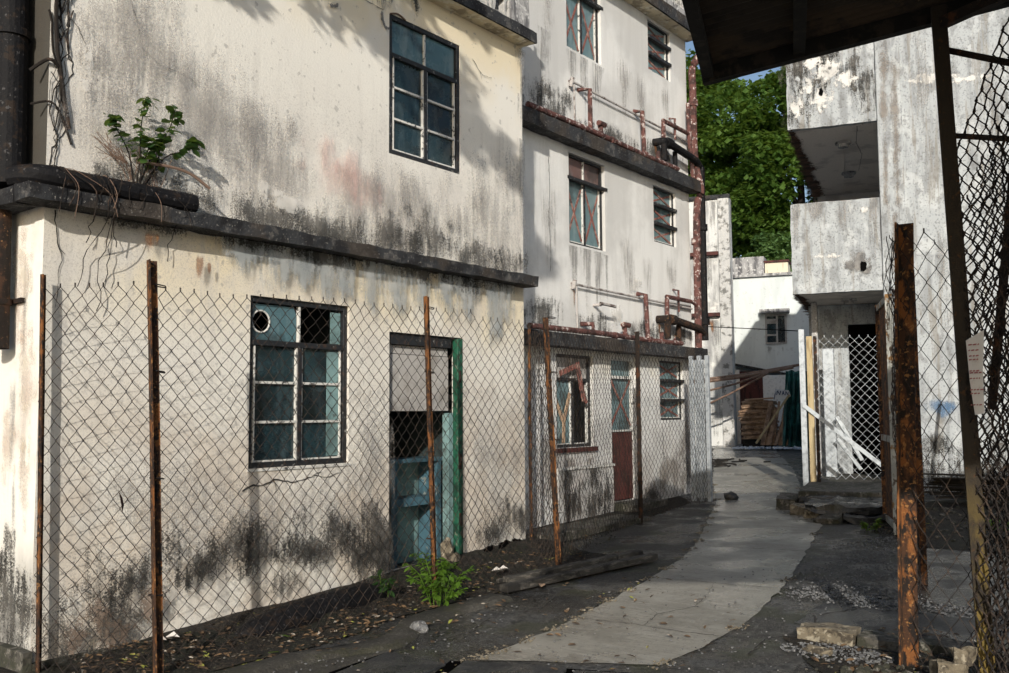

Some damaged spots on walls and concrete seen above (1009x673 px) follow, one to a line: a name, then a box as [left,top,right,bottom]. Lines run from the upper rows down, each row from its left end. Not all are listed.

leakage [522,75,572,116]
leakage [543,439,617,522]
leakage [0,526,151,664]
leakage [162,498,394,596]